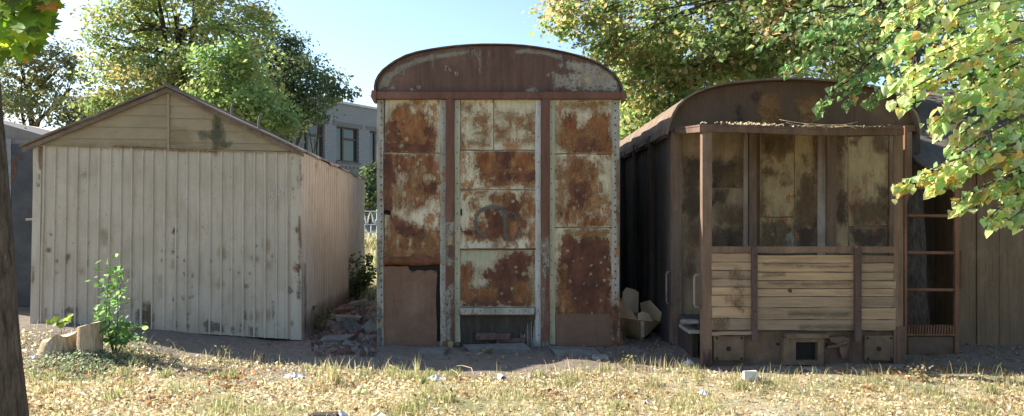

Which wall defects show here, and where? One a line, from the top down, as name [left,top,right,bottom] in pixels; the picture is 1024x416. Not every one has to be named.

peeling [546,60,619,92]
rust [383,103,440,264]
rust [460,105,535,306]
rust [555,100,622,346]
leakage [761,134,817,246]
leakage [836,136,889,225]